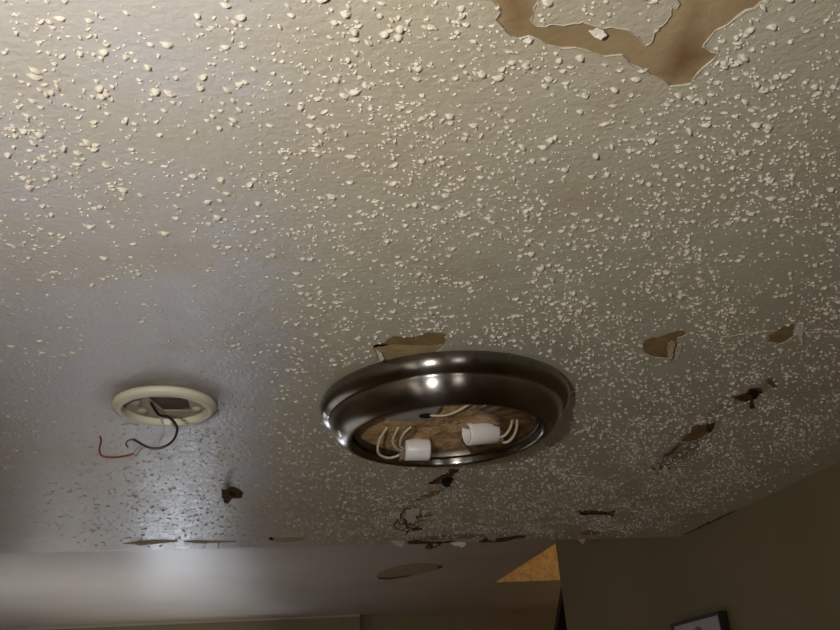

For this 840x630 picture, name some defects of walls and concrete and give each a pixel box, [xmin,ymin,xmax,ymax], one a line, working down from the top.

peeling [485,0,770,88]
peeling [373,332,447,362]
peeling [643,331,686,361]
peeling [767,323,804,345]
peeling [653,422,715,475]
spalling [221,487,244,504]
crack [391,508,525,549]
peeling [377,563,443,580]